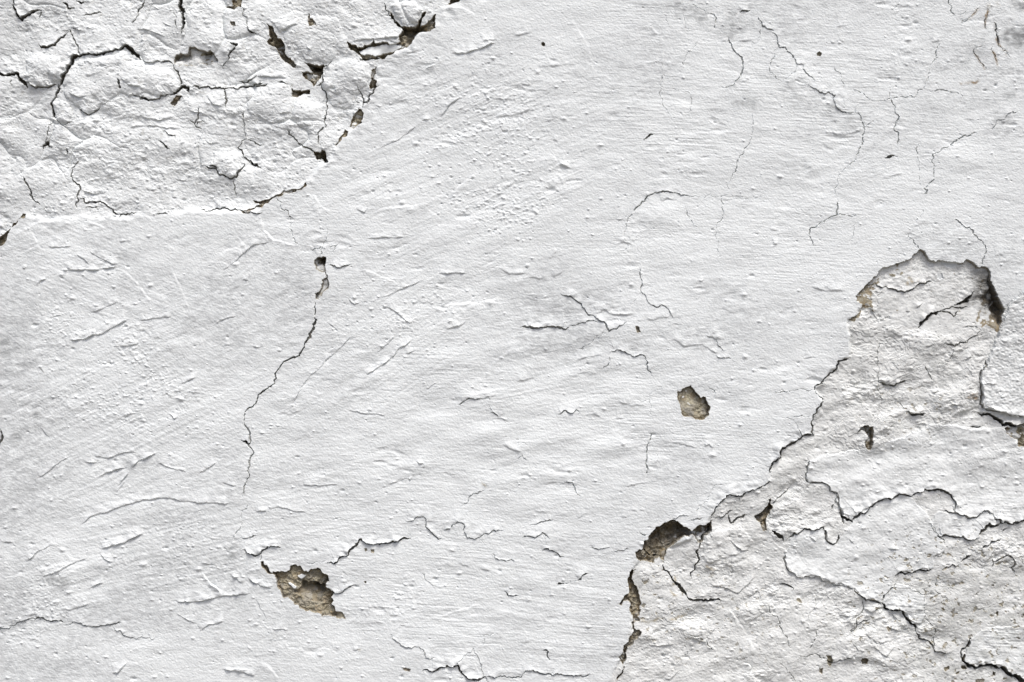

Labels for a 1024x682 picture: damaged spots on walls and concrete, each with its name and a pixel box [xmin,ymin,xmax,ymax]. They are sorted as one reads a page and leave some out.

peeling [0,0,461,246]
crack [642,0,1019,251]
crack [519,113,768,476]
crack [233,300,318,562]
spalling [261,561,347,620]
peeling [609,249,1024,682]